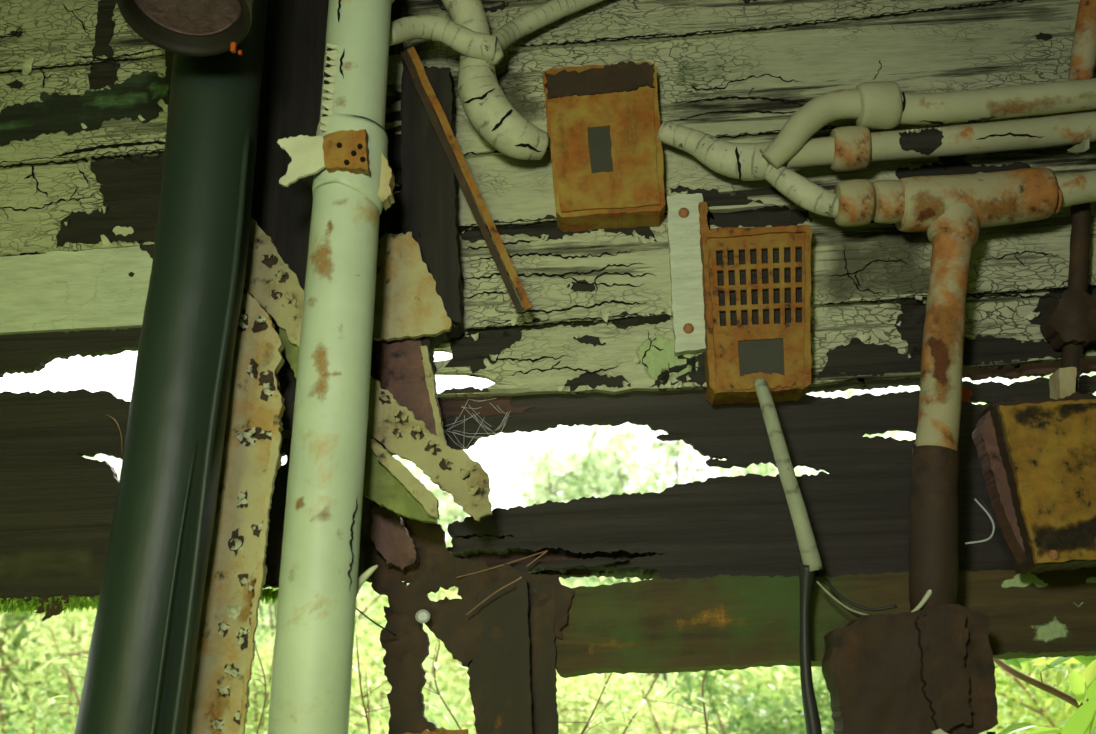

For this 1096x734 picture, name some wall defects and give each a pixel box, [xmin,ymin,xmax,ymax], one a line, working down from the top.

crack [0,4,164,89]
peeling [0,0,169,147]
crack [0,141,165,220]
corrosion [698,202,709,235]
crack [459,219,663,376]
corrosion [315,348,327,392]
peeling [434,308,671,377]
peeling [818,291,926,384]
corrosion [929,310,959,400]
peeling [963,334,1062,370]
mould [1015,403,1096,424]
damp [1035,517,1096,555]